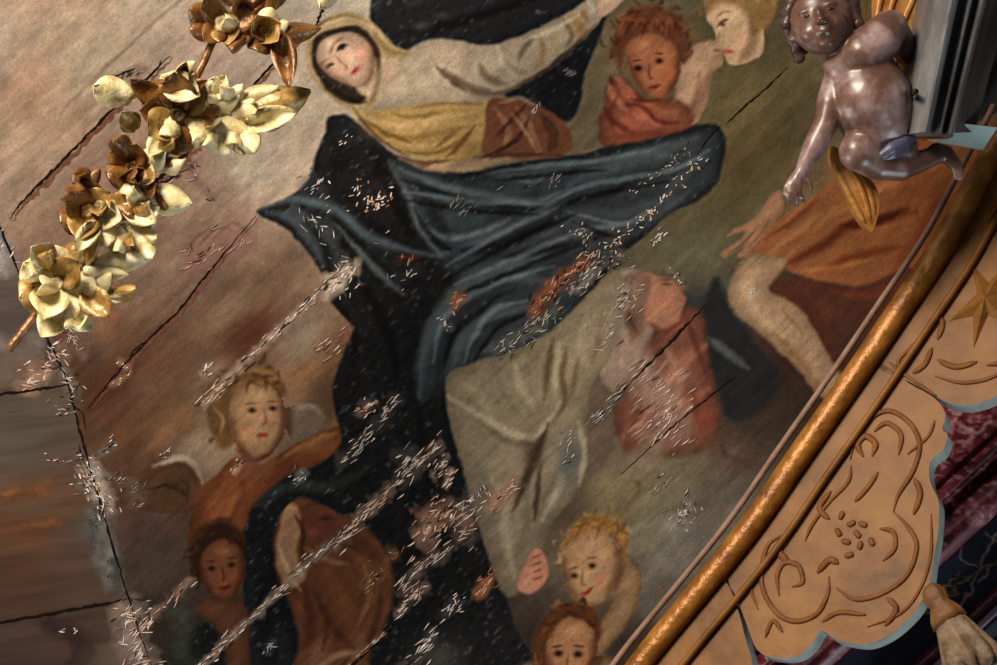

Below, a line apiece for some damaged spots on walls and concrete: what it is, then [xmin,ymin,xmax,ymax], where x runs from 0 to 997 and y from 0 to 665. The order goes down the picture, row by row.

crack [155,147,202,184]
peeling [15,328,85,415]
peeling [196,165,359,405]
peeling [437,292,466,331]
peeling [496,140,708,359]
crack [614,305,705,401]
peeling [44,434,144,520]
crack [0,216,259,665]
peeling [341,394,402,463]
crack [630,377,735,466]
peeling [198,430,520,665]
peeling [110,580,197,665]